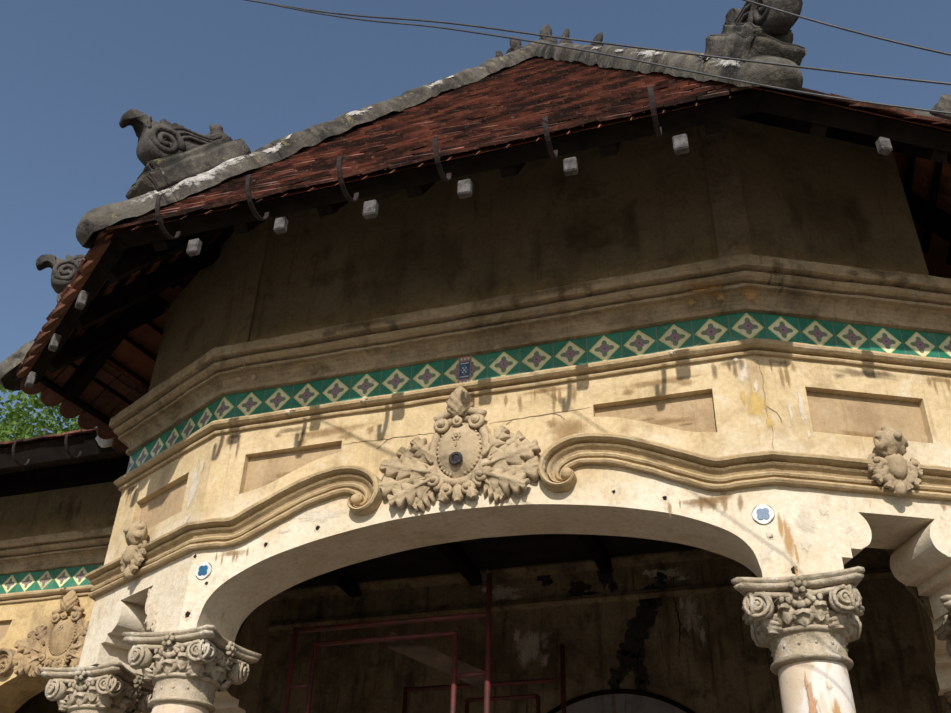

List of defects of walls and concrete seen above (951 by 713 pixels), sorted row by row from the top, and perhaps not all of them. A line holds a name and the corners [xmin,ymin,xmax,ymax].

crack [489,407,589,425]
peeling [607,568,688,692]
peeling [804,673,841,713]